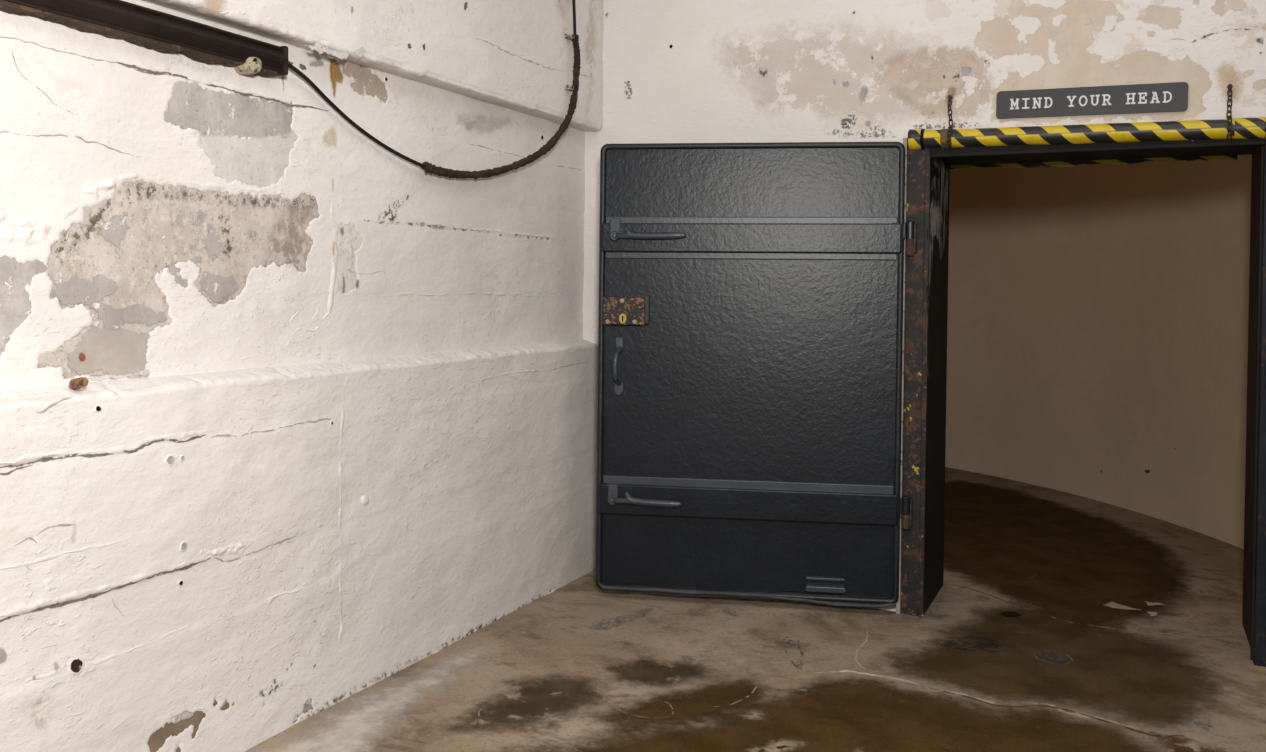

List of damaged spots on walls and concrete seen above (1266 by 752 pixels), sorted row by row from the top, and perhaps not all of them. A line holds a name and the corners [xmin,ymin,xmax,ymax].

peeling [973,0,1247,125]
peeling [1242,70,1266,91]
peeling [0,81,320,382]
crack [0,418,333,475]
crack [0,524,124,570]
crack [0,536,296,622]
water stain [456,481,1216,752]
peeling [147,699,234,752]